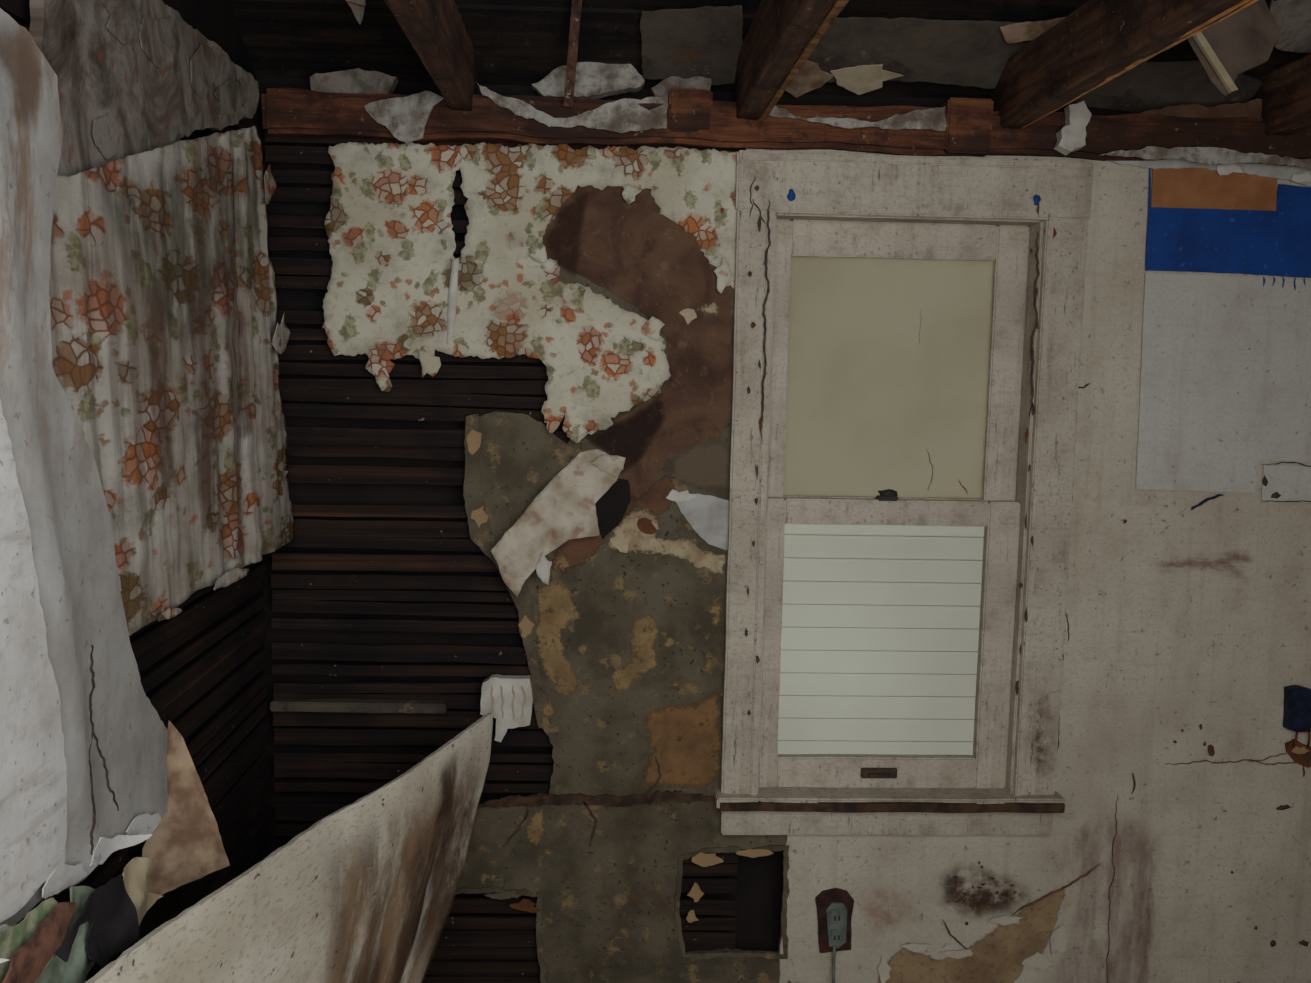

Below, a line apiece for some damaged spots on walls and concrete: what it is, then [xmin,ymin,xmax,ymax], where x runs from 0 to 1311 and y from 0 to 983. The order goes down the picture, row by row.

flaking render [463,184,771,728]
crack [89,645,119,855]
flaking render [641,694,722,788]
crack [1165,753,1296,765]
water stain [329,765,472,983]
flaking render [454,885,548,983]
flaking render [526,811,551,855]
flaking render [674,845,790,961]
mould [946,861,1022,925]
flaking render [877,863,1101,983]